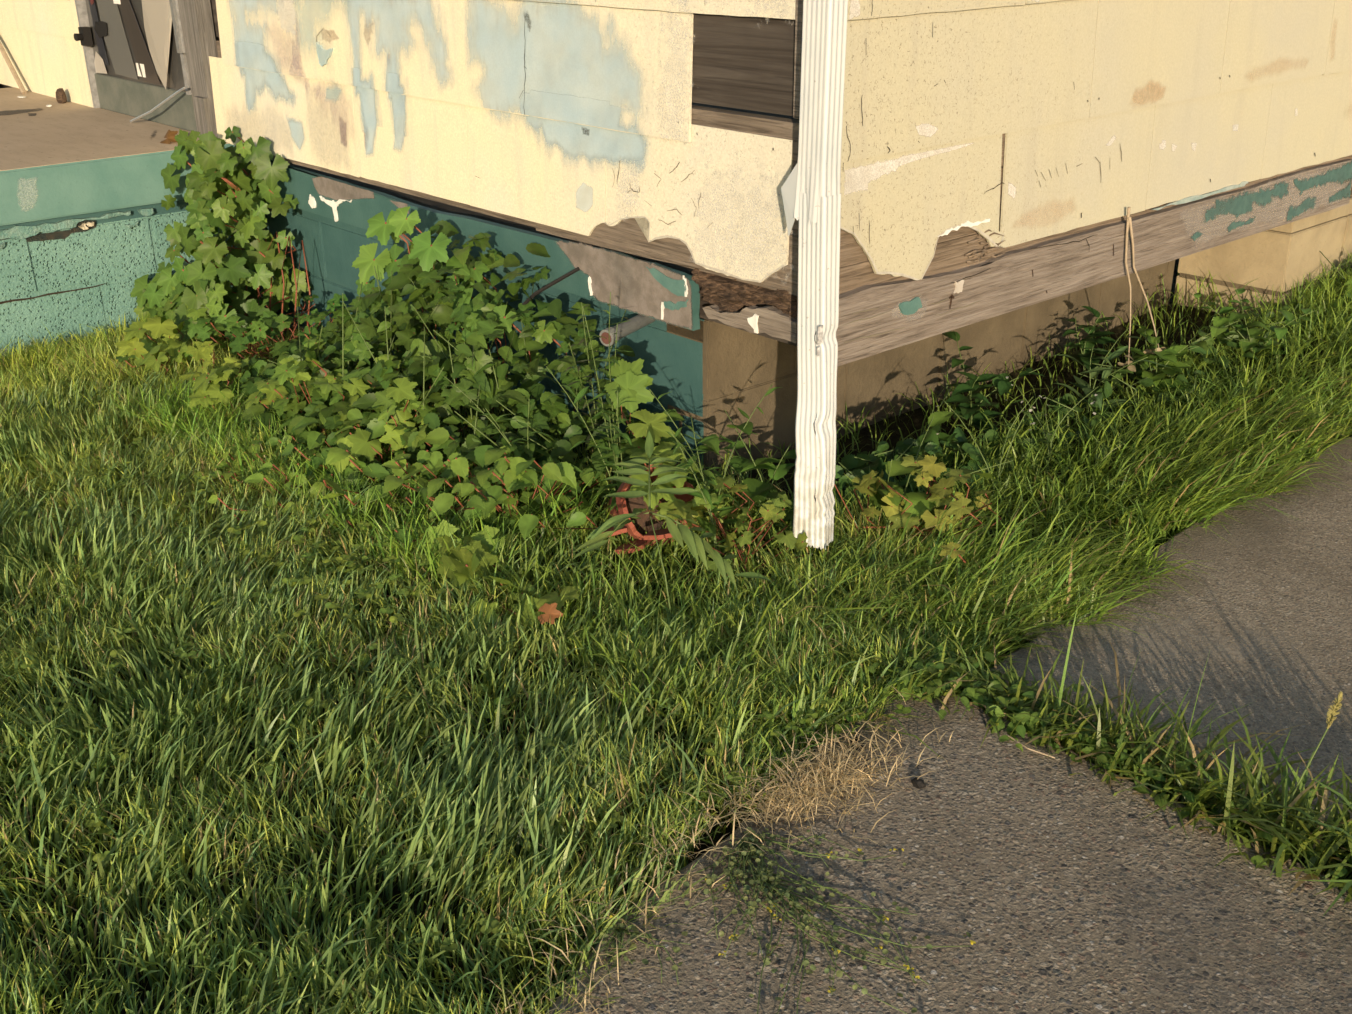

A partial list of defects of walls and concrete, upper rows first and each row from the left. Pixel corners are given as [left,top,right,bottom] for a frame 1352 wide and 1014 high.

peeling [316,42,333,67]
peeling [844,124,972,195]
spalling [0,208,154,249]
spalling [605,216,783,283]
spalling [840,218,1004,280]
peeling [1152,162,1352,241]
peeling [557,241,692,329]
peeling [747,314,759,334]